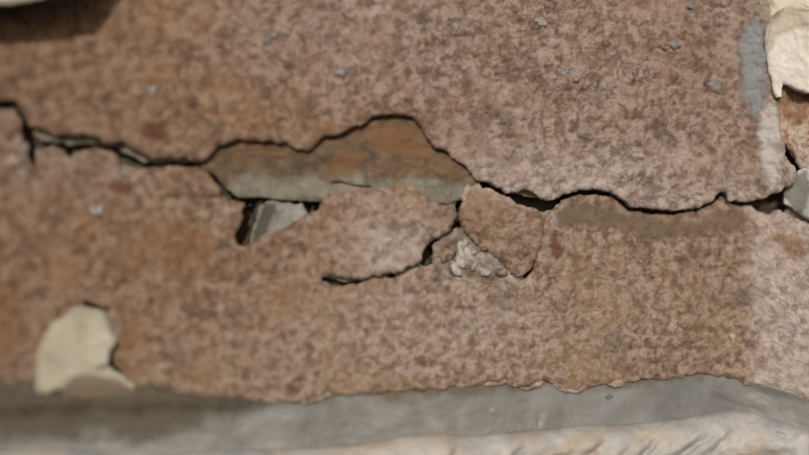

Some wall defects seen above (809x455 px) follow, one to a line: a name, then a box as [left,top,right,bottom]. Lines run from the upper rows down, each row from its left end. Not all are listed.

peeling [764,0,809,221]
crack [0,101,322,247]
spalling [200,115,481,243]
crack [479,182,789,215]
crack [785,148,800,172]
crack [322,277,362,286]
crack [420,200,461,266]
spalling [431,227,524,284]
peeling [35,306,137,403]